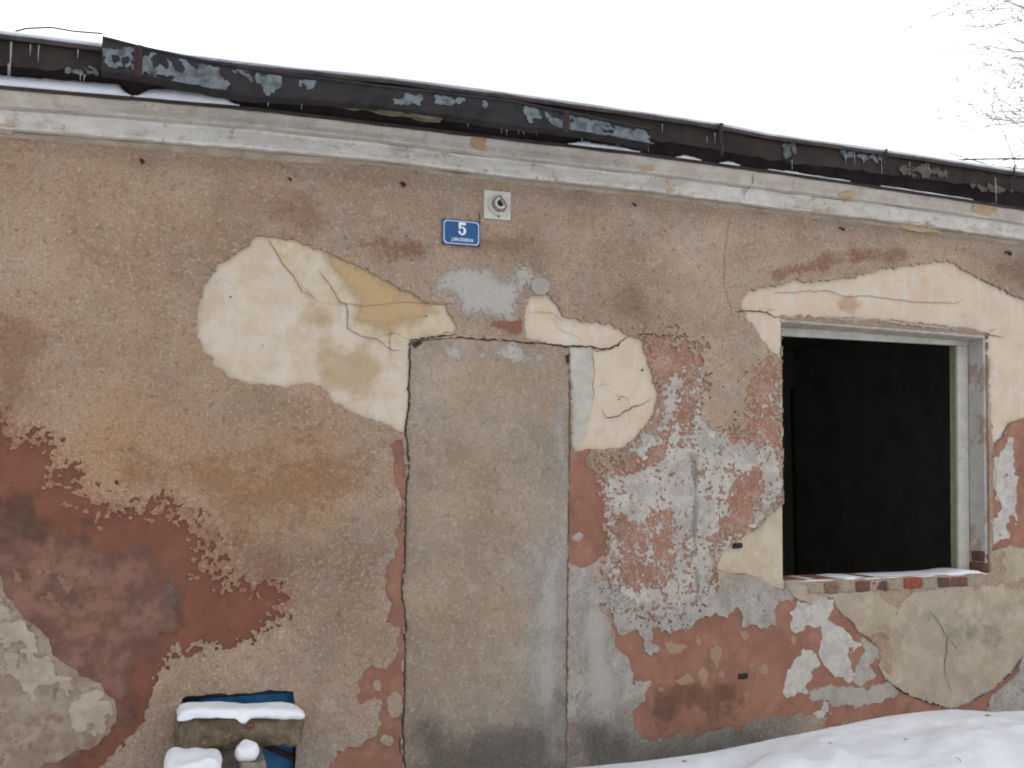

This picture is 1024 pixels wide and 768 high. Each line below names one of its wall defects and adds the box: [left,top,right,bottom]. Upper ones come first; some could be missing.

peeling [65,47,282,96]
peeling [299,79,316,89]
peeling [393,93,466,106]
peeling [470,136,487,151]
peeling [523,106,654,144]
crack [724,179,998,337]
spalling [196,235,457,768]
crack [268,239,692,768]
flaking render [524,260,1024,741]
flaking render [0,406,292,768]
crack [853,610,1023,708]